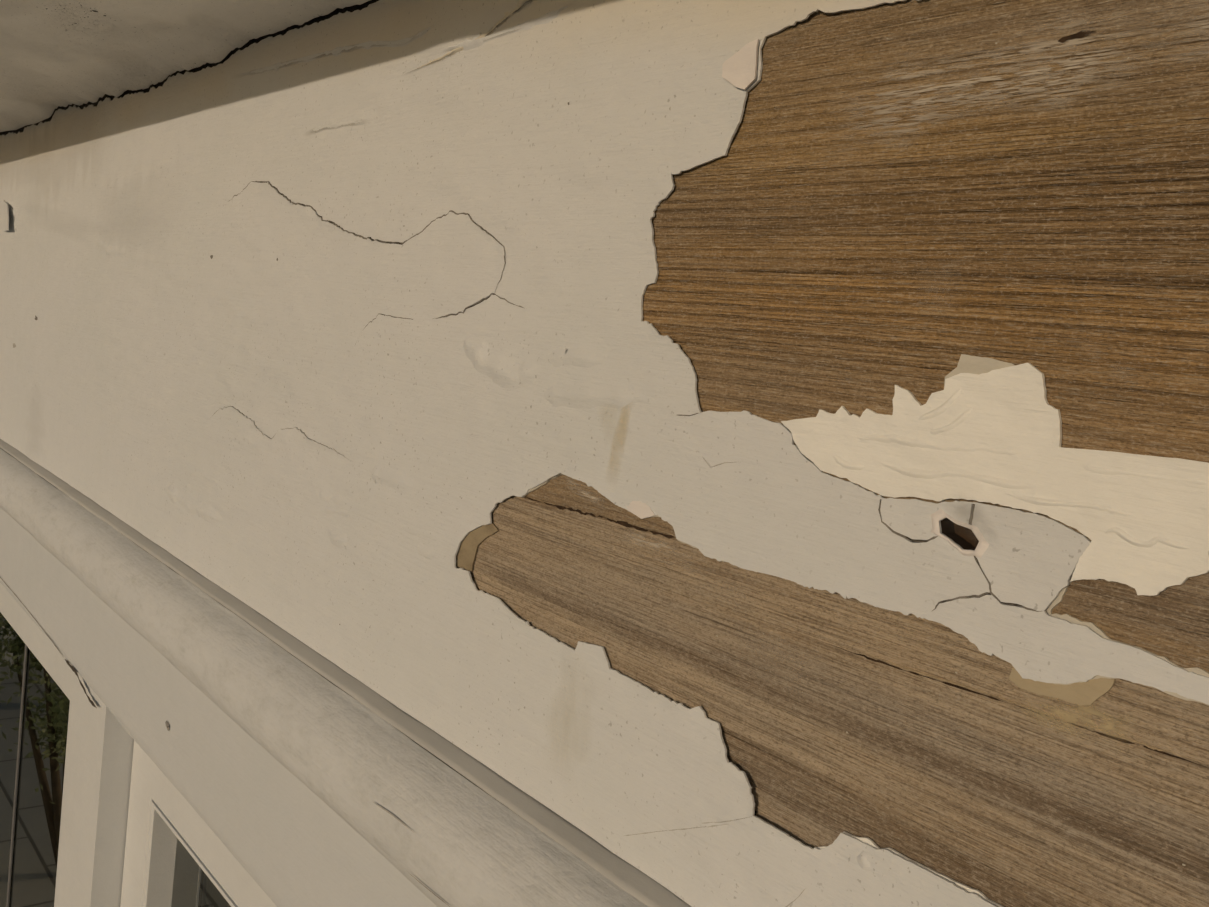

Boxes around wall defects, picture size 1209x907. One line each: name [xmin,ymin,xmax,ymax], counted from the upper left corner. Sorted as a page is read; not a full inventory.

crack [0,0,379,136]
crack [228,181,525,346]
peeling [643,0,1209,677]
crack [878,501,938,542]
crack [967,505,975,525]
crack [932,556,1041,612]
peeling [456,473,1209,907]